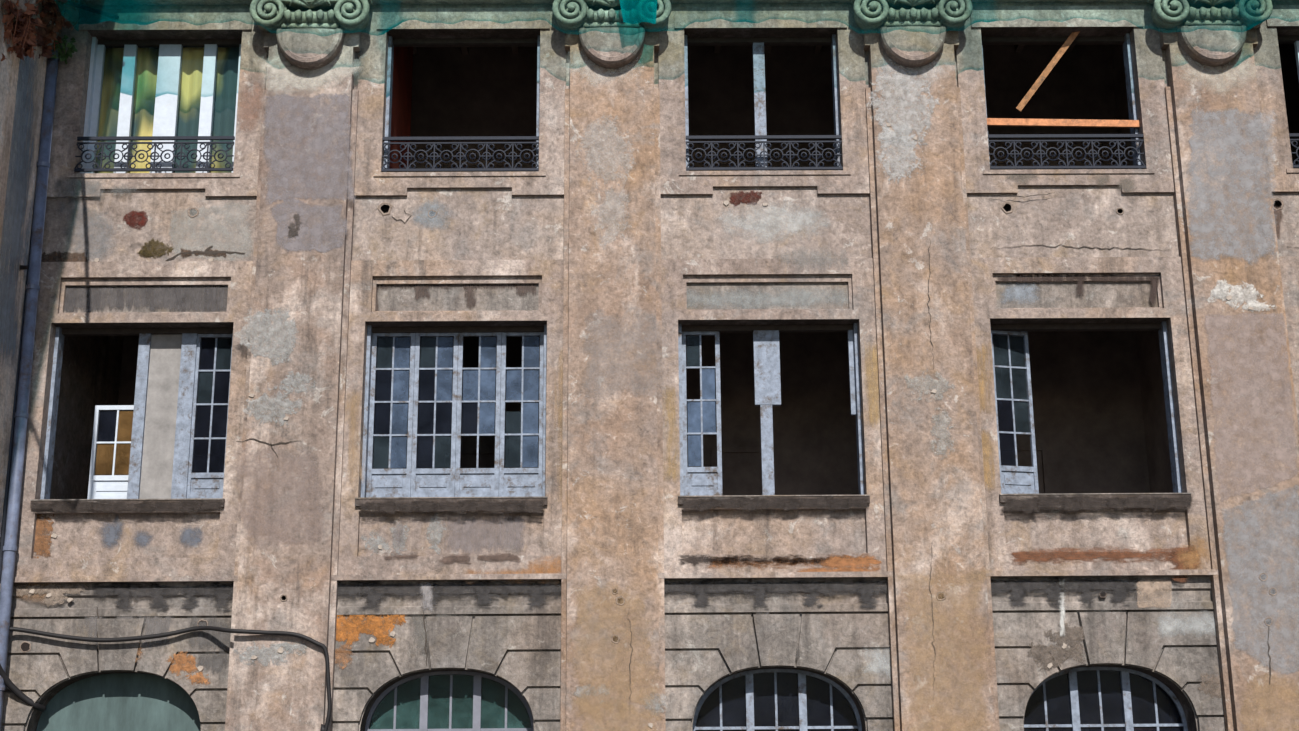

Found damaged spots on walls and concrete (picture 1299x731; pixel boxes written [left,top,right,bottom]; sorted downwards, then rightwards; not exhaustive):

spalling [723,190,768,206]
peeling [1208,280,1275,312]
spalling [34,514,58,558]
spalling [335,614,406,670]
spalling [166,651,210,687]